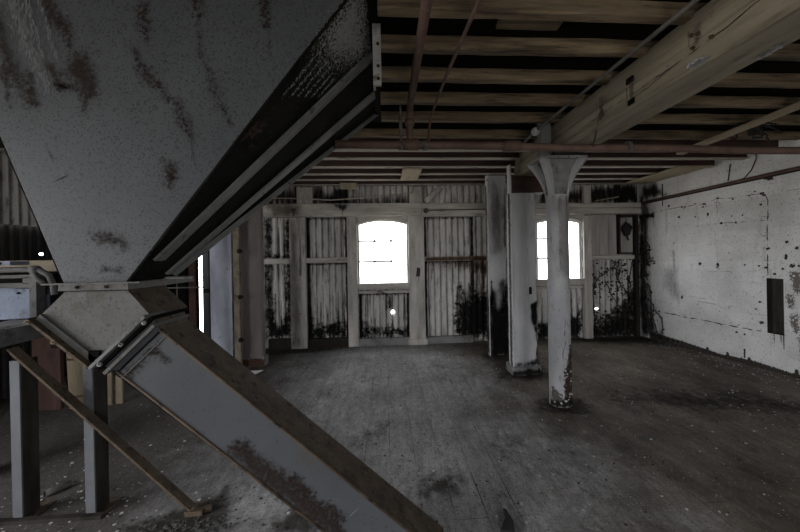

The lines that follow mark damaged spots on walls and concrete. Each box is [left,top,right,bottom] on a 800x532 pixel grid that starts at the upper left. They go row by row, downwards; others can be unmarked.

corrosion [38,0,99,111]
peeling [550,344,573,408]
corrosion [227,441,346,532]